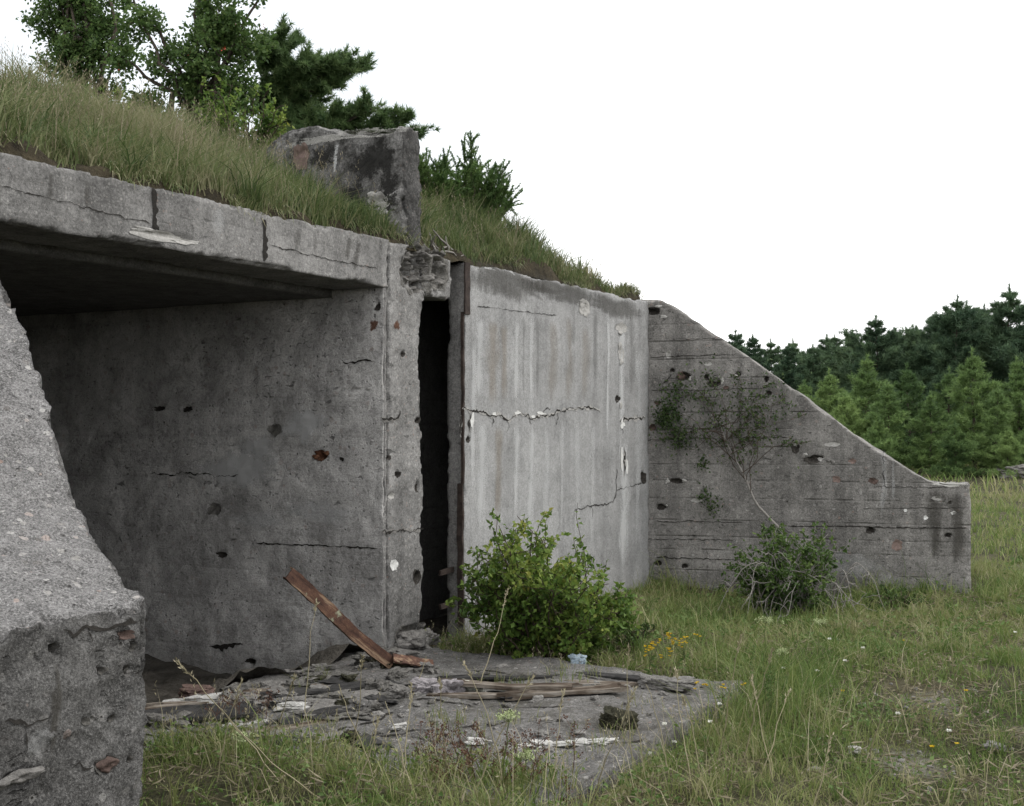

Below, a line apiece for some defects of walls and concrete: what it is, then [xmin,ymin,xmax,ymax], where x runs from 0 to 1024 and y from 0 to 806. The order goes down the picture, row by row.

crack [0,185,149,223]
crack [272,245,377,269]
spalling [399,241,449,297]
water stain [472,323,483,410]
efflorescence [606,324,625,428]
crack [257,526,421,549]
water stain [471,426,485,515]
water stain [514,431,534,520]
crack [459,404,787,516]
efflorescence [619,448,629,559]
water stain [928,493,964,556]